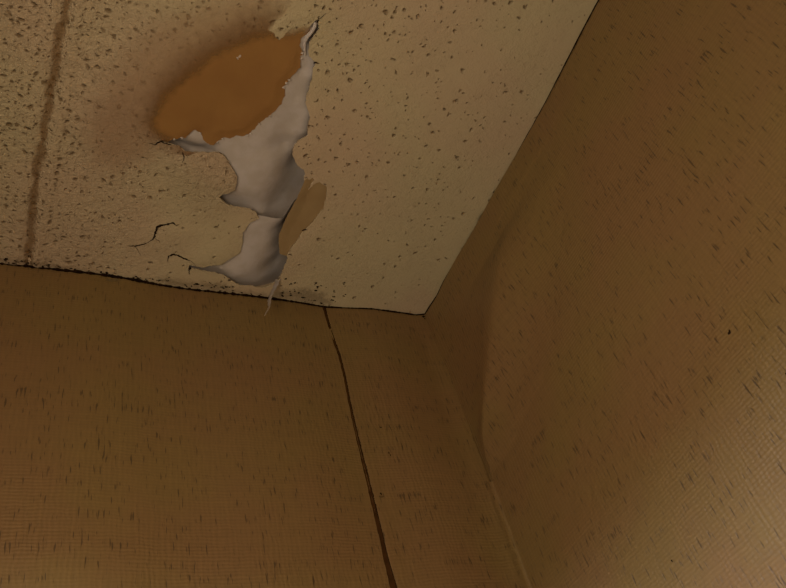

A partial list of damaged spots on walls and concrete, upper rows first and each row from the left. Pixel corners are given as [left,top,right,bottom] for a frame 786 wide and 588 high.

flaking render [161,10,319,286]
crack [515,0,599,156]
crack [0,222,451,586]